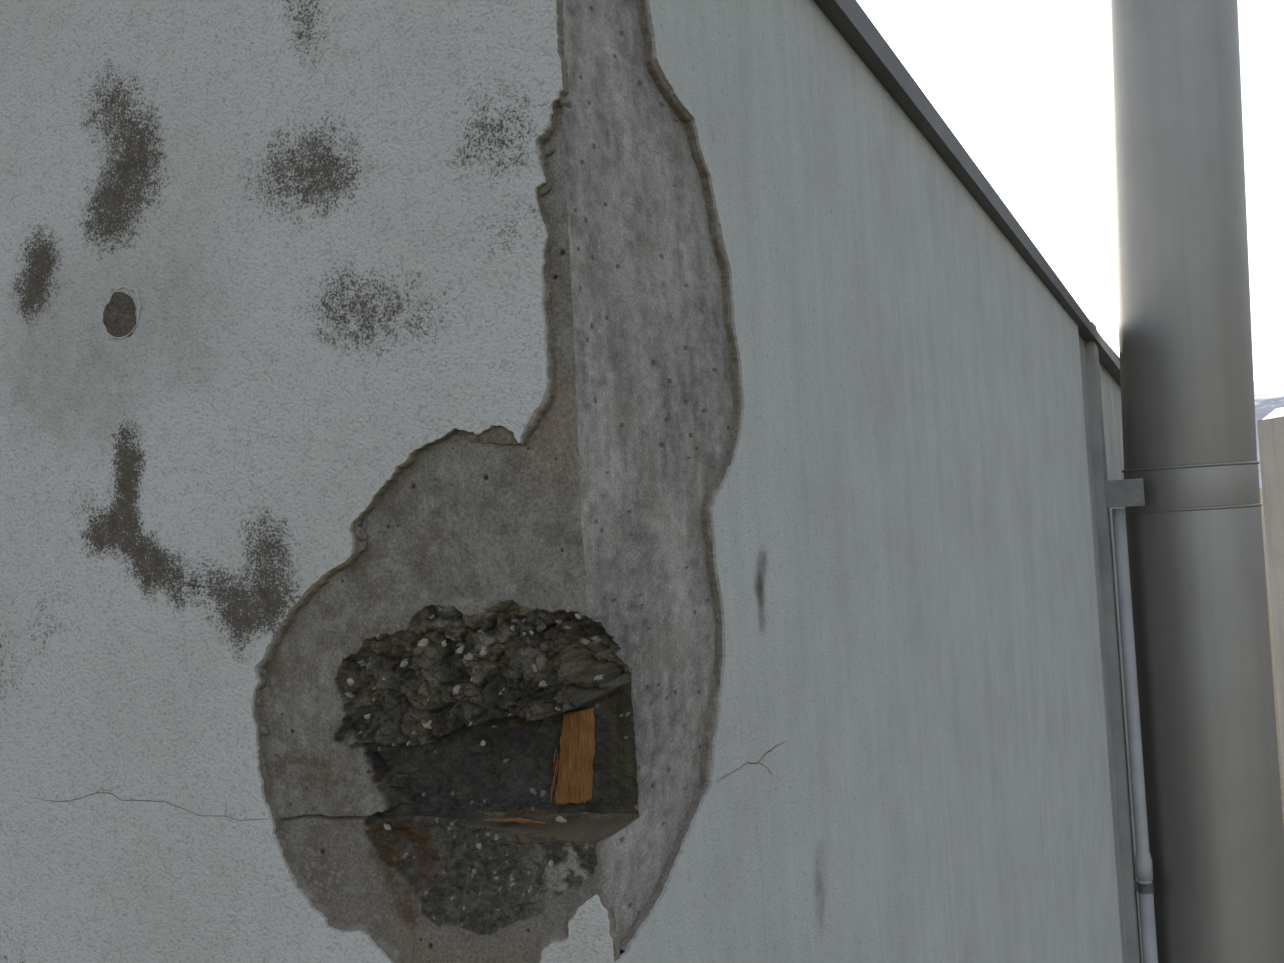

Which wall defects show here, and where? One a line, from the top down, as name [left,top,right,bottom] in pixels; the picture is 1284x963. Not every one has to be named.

leakage [80,63,167,259]
leakage [247,117,365,219]
mould [455,86,539,174]
leakage [11,225,62,323]
flaking render [103,286,142,339]
leakage [310,269,446,355]
spalling [254,0,742,963]
leakage [81,419,300,659]
crack [32,790,365,821]